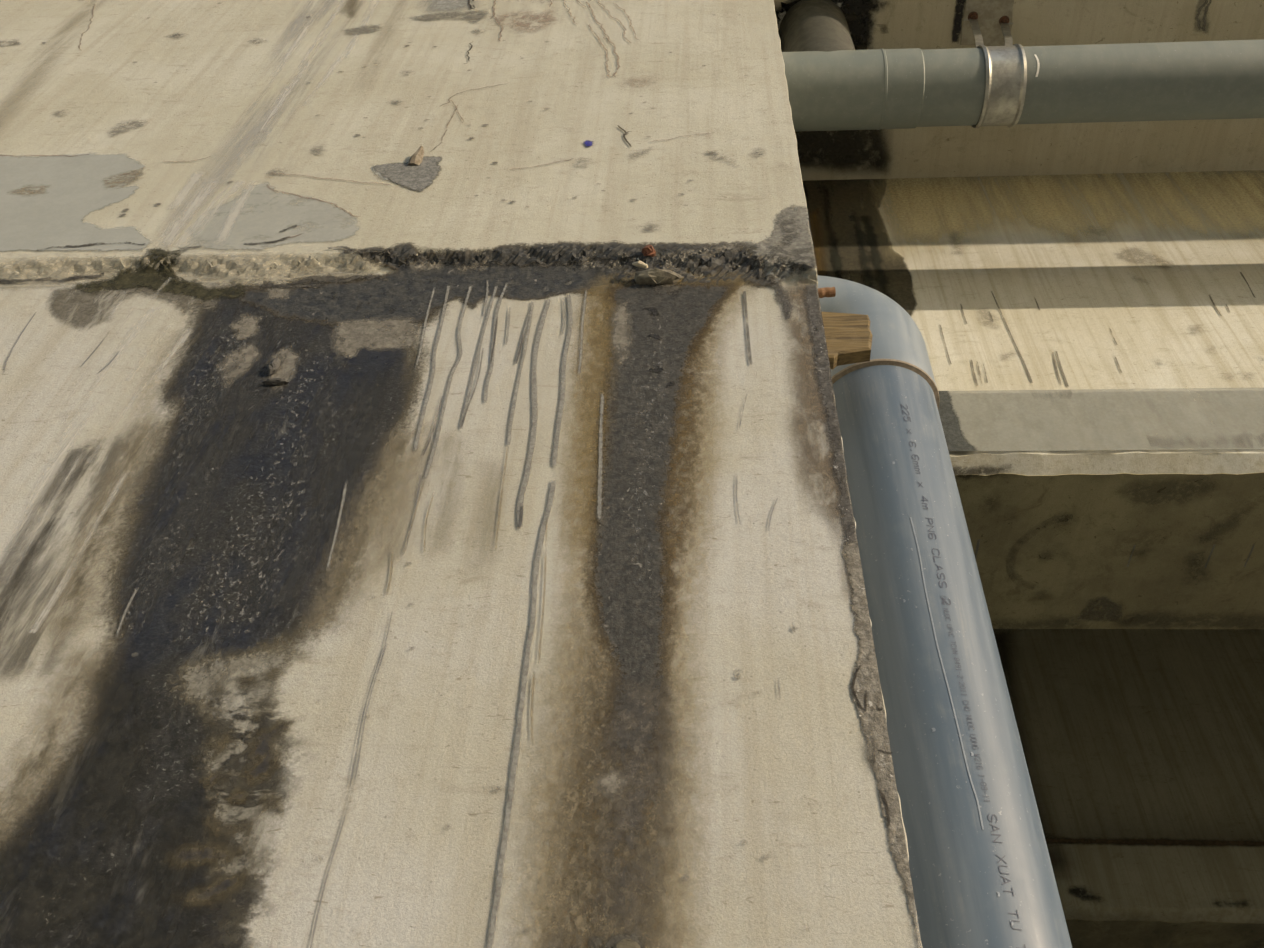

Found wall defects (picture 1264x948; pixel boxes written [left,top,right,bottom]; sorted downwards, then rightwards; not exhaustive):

crack [433,0,503,150]
crack [550,0,637,76]
peeling [0,153,151,252]
peeling [188,183,359,250]
water stain [0,240,781,948]